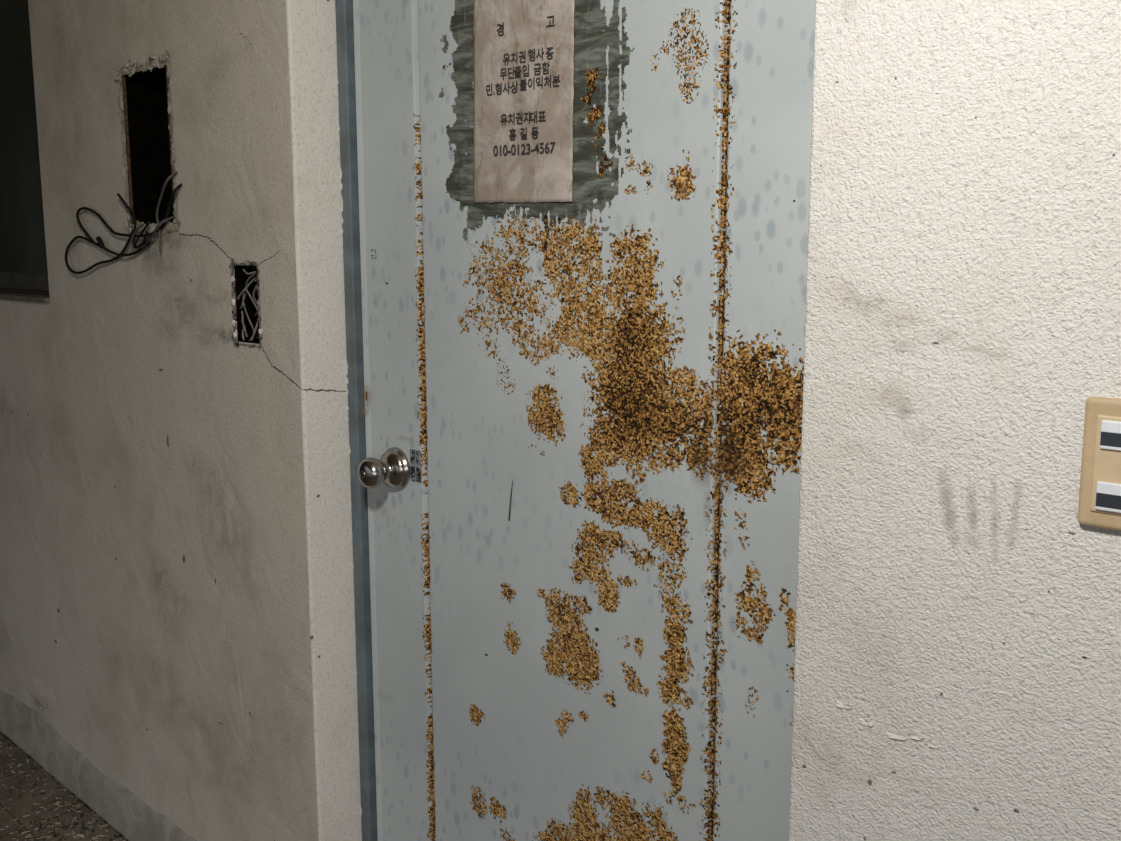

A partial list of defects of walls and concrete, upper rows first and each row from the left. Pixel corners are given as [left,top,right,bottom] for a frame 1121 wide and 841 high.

crack [179,233,231,260]
crack [261,345,347,392]
corrosion [413,114,428,494]
corrosion [458,0,804,841]
corrosion [421,512,436,841]